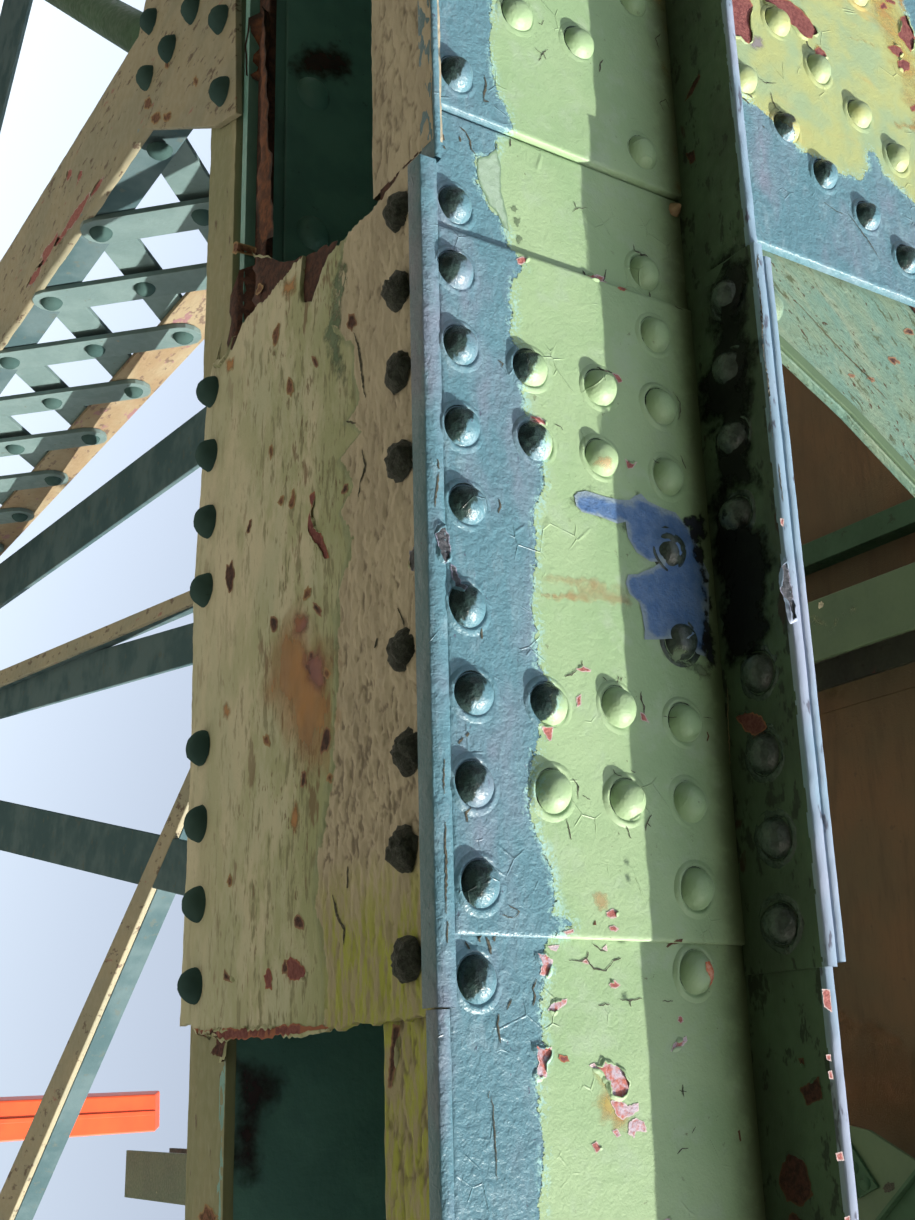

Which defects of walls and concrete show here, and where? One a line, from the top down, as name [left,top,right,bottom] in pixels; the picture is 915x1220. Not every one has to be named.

rust [294,46,351,79]
rust [213,7,338,371]
peeling [583,271,626,291]
rust [271,615,328,754]
peeling [542,725,553,741]
peeling [534,929,574,979]
peeling [548,998,567,1016]
rust [194,1023,332,1043]
peeling [531,1043,570,1083]
rust [234,1063,279,1180]
peeling [589,1057,647,1138]
rust [779,1150,813,1207]